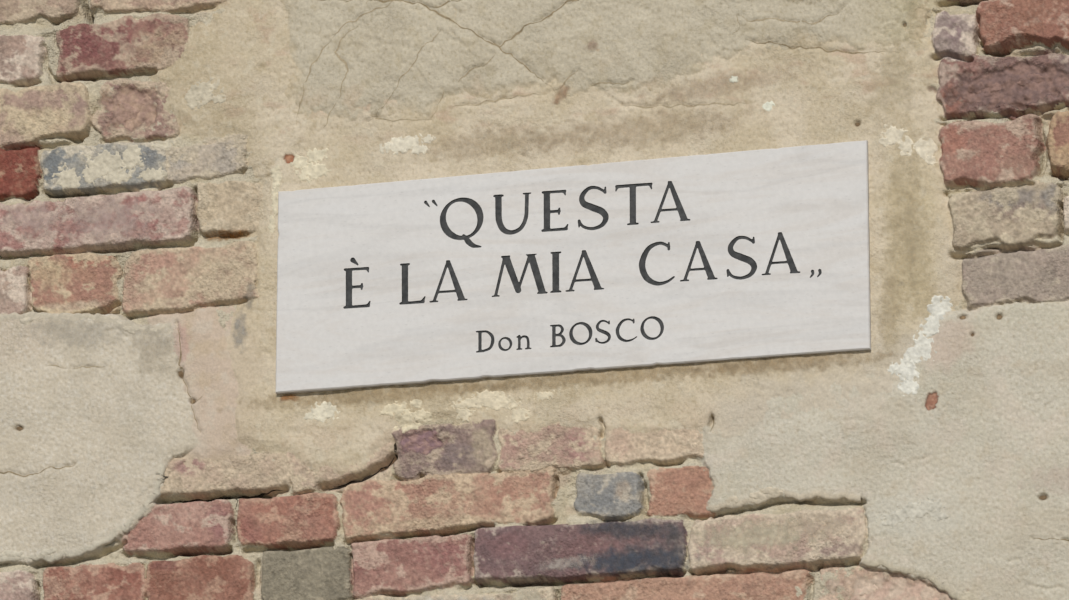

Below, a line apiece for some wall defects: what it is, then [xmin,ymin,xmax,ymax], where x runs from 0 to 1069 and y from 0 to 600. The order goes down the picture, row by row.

crack [734,5,899,54]
crack [296,0,741,127]
spalling [101,87,157,131]
peeling [184,77,226,111]
peeling [52,138,177,197]
peeling [0,311,171,336]
peeling [379,389,557,455]
peeling [0,463,169,564]
peeling [706,487,861,513]